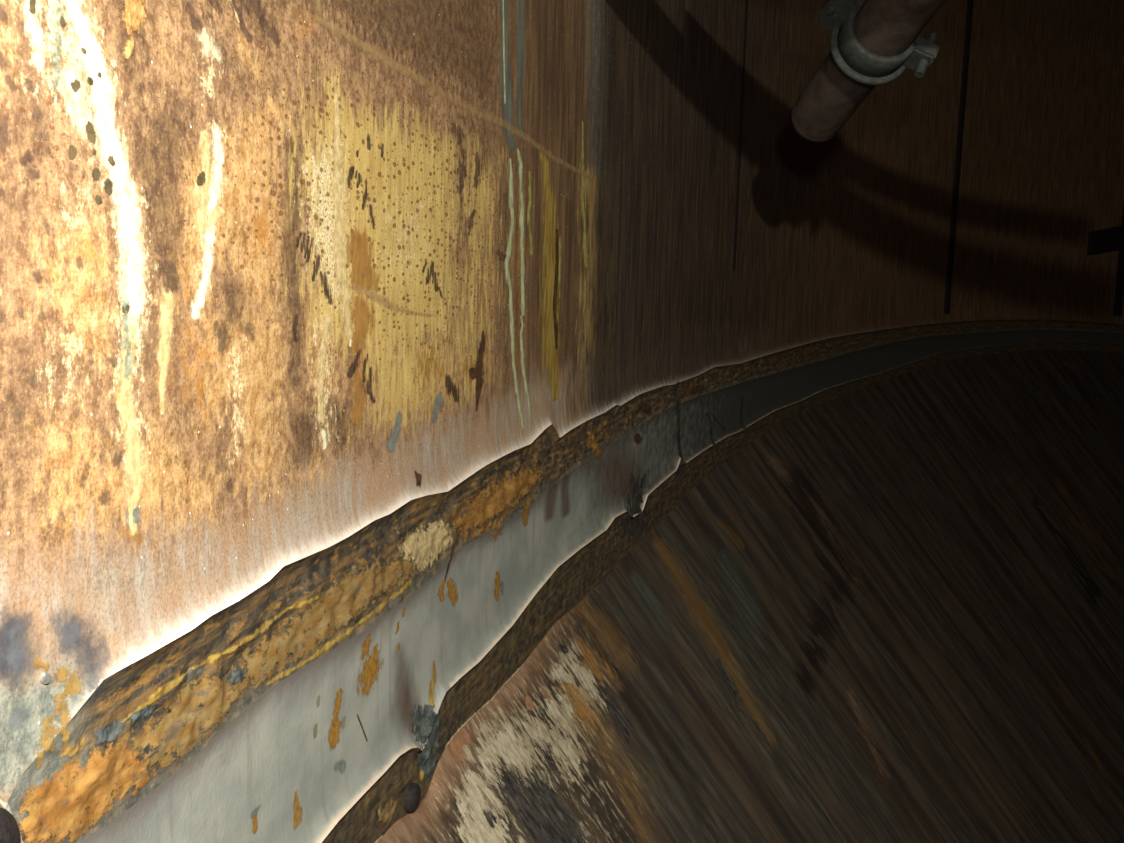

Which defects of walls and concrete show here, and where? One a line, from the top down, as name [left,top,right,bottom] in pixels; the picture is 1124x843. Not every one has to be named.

damp [23,0,149,535]
damp [191,127,224,319]
damp [317,76,353,450]
damp [388,412,402,452]
damp [500,0,561,431]
corrosion [15,463,543,843]